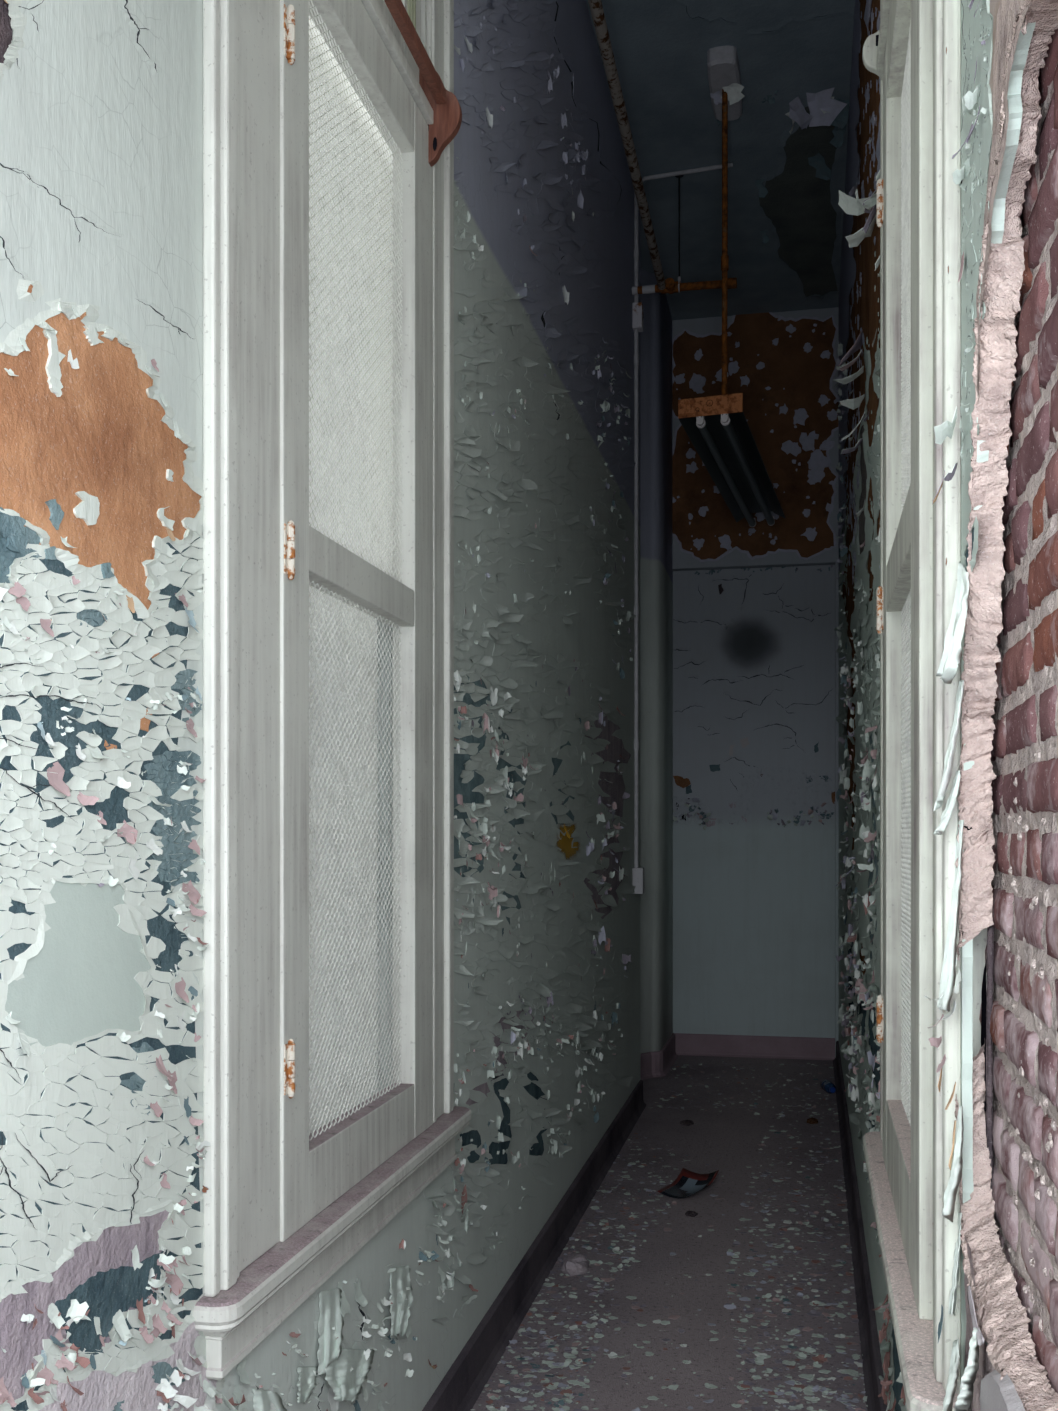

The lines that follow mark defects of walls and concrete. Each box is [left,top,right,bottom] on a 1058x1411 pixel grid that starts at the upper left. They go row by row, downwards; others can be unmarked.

peeling [0,0,27,81]
crack [12,0,49,73]
crack [118,0,163,75]
crack [0,126,124,244]
crack [0,231,31,305]
crack [132,296,197,342]
peeling [0,279,204,629]
peeling [672,0,881,1257]
spalling [924,0,1058,1411]
peeling [0,604,638,1411]
peeling [872,1294,908,1411]